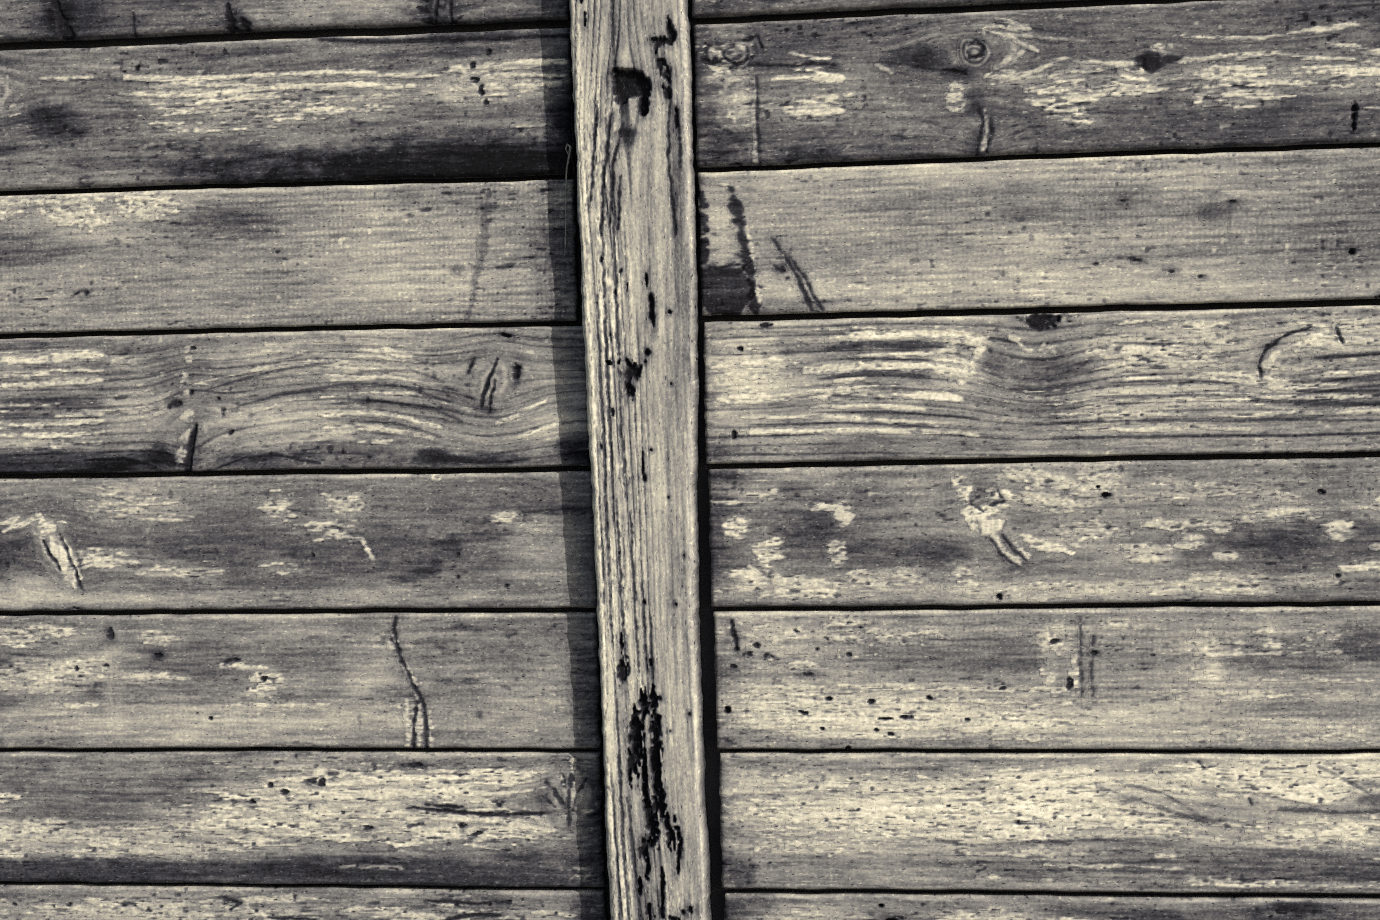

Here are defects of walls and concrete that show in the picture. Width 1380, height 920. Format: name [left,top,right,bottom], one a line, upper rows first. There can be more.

crack [608,0,617,67]
crack [697,33,838,166]
crack [664,99,684,238]
crack [769,236,826,313]
crack [40,532,84,591]
crack [388,615,430,748]
crack [404,100,655,920]
crack [728,618,740,651]
crack [969,488,1029,568]
peeling [709,461,1380,749]
peeling [722,719,1380,890]
crack [221,896,317,920]